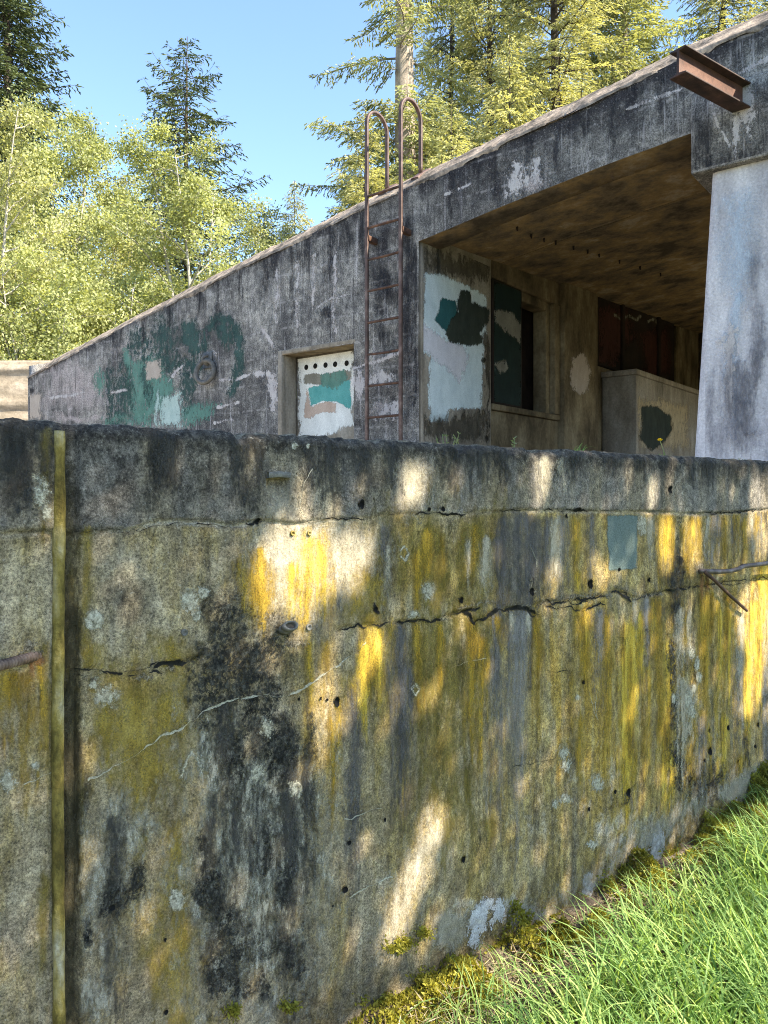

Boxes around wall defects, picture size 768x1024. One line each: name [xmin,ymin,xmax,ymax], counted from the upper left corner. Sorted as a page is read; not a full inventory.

peeling [93,312,246,429]
water stain [350,218,490,421]
peeling [424,272,521,423]
water stain [127,332,569,1024]
crack [70,542,767,781]
crack [350,876,393,898]
spalling [466,896,510,950]